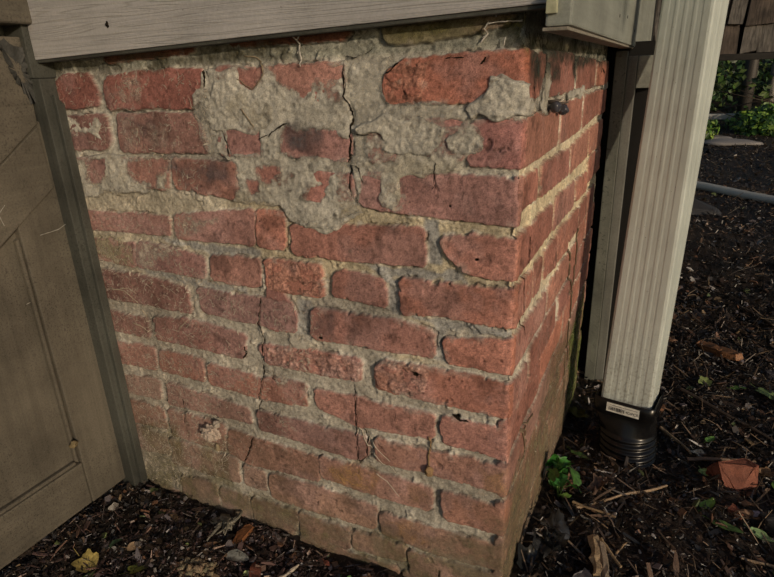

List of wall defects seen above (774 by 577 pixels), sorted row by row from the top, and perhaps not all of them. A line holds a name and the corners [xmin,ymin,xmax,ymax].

peeling [206,79,273,135]
crack [342,46,373,199]
peeling [354,61,483,156]
peeling [465,76,531,122]
damp [526,34,607,80]
crack [243,299,275,407]
crack [354,388,369,474]